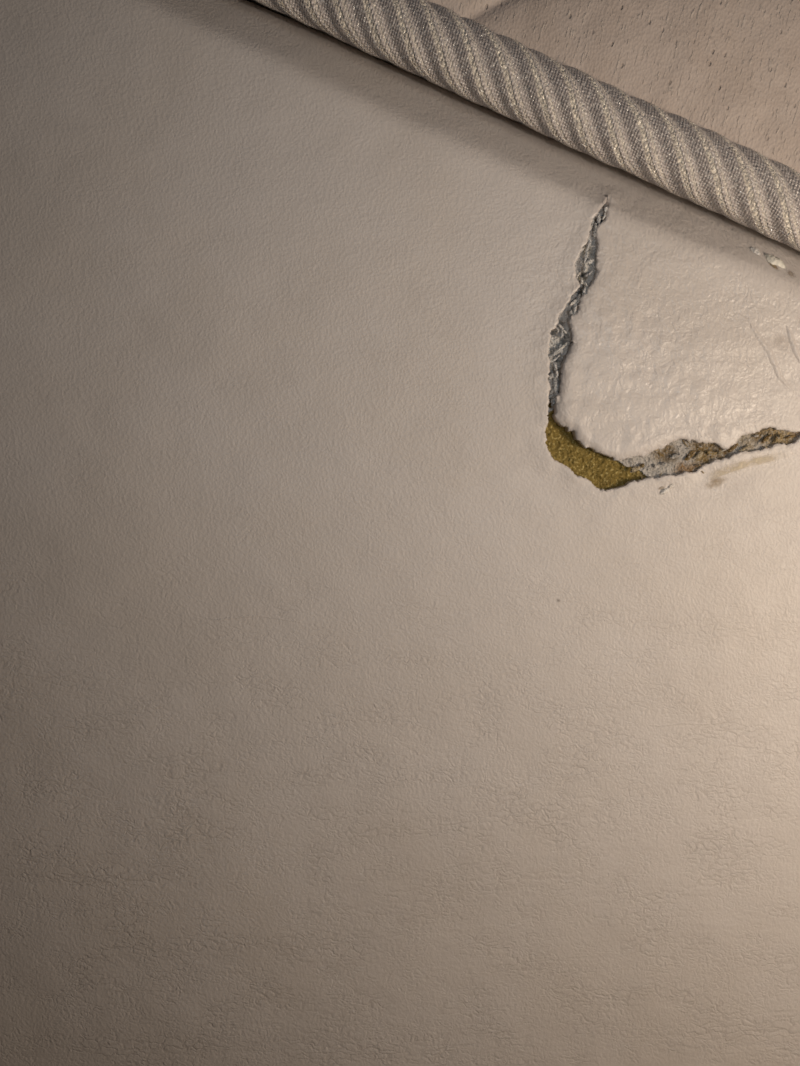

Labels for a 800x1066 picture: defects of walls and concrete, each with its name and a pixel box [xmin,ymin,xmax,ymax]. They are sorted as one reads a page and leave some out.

peeling [750,247,793,276]